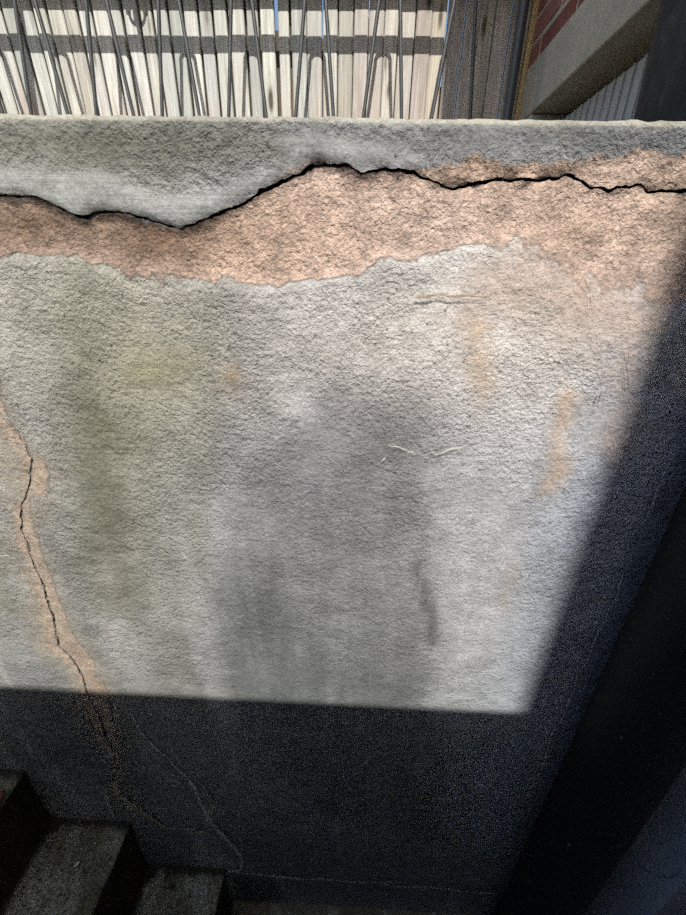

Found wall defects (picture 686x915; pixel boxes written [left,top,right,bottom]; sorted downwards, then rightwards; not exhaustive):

crack [0,163,686,231]
spalling [0,148,686,304]
crack [416,291,489,299]
crack [552,354,630,468]
spalling [0,400,116,773]
crack [0,415,498,894]
crack [527,576,623,798]